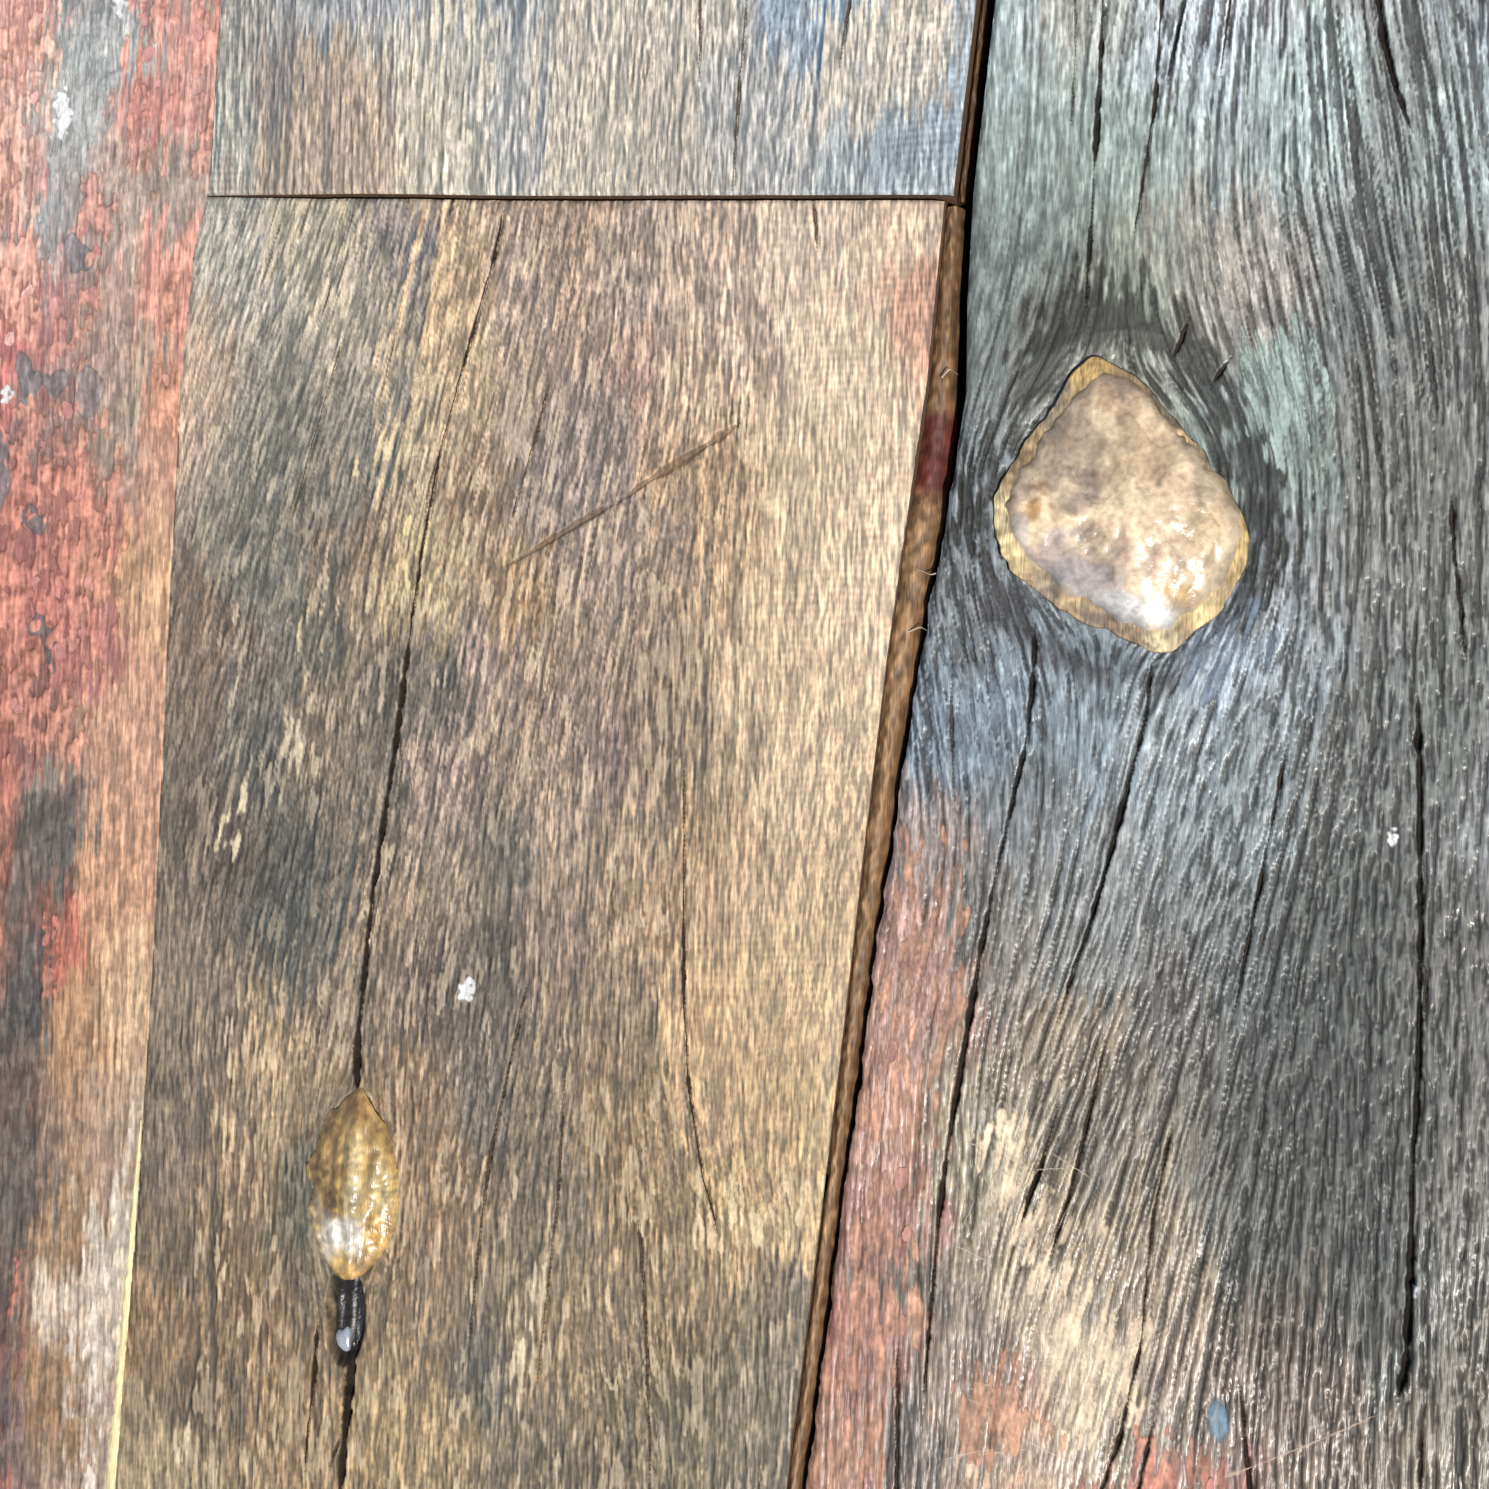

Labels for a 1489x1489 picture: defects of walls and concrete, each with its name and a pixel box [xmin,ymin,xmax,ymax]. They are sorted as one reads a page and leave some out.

crack [1376,0,1410,126]
peeling [0,0,221,768]
crack [353,215,502,1086]
crack [682,784,716,1225]
crack [895,629,1037,1489]
crack [1022,1047,1105,1252]
crack [1059,662,1153,1017]
crack [1397,701,1426,1394]
crack [305,1289,361,1489]